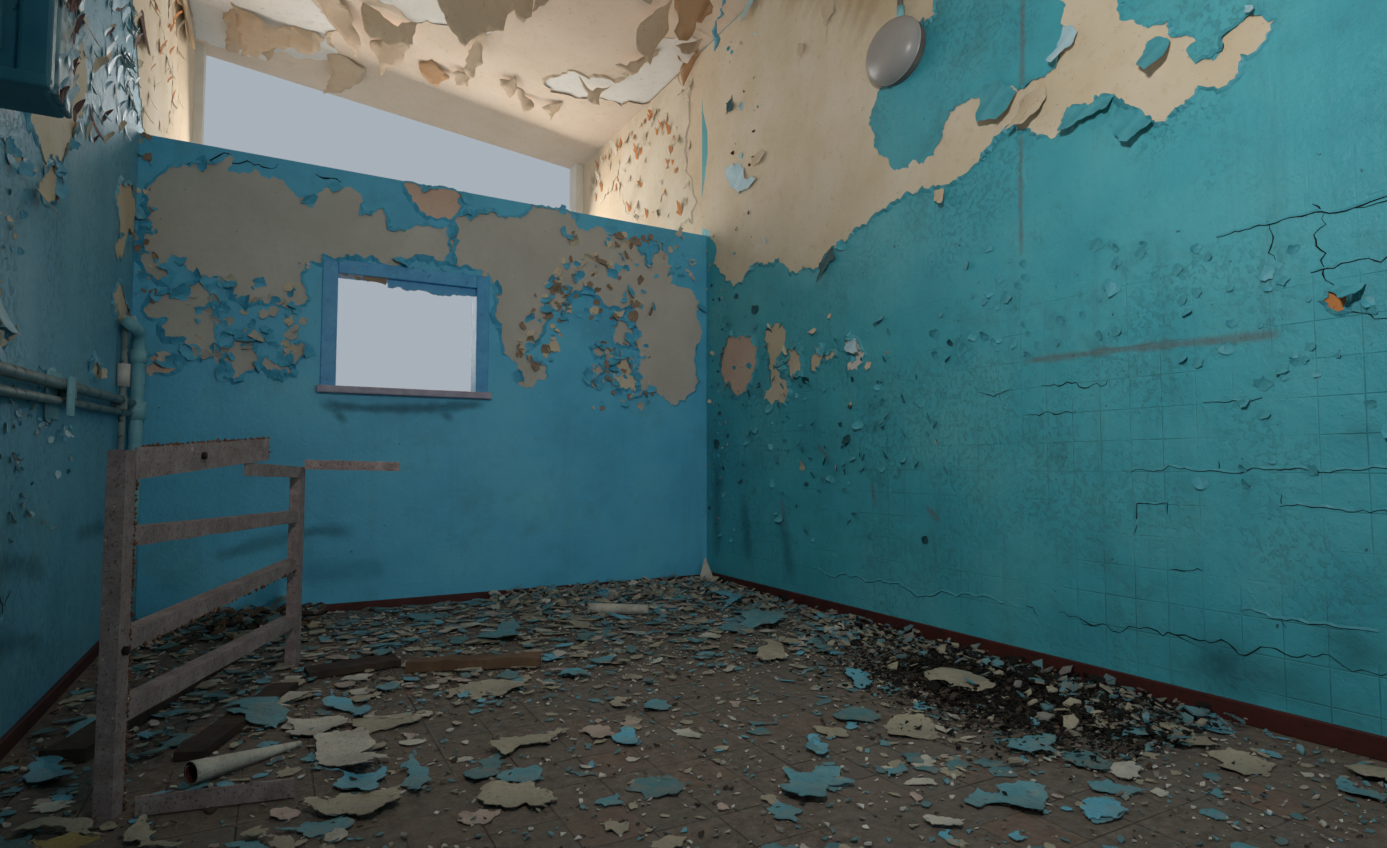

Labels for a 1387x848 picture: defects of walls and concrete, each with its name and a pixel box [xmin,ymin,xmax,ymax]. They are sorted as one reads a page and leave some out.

peeling [0,0,1277,548]
crack [1216,193,1387,319]
peeling [1305,282,1377,316]
crack [1129,461,1387,533]
crack [818,567,1386,676]